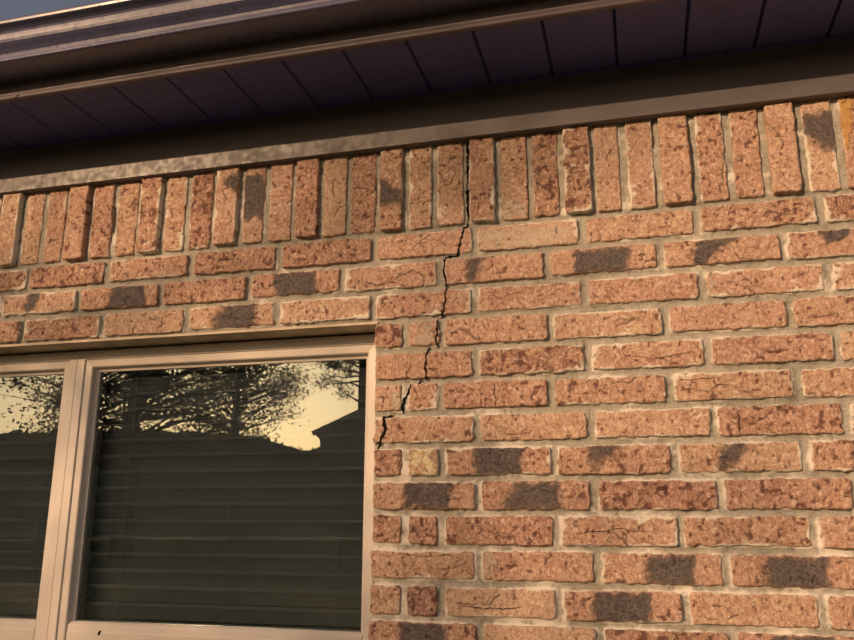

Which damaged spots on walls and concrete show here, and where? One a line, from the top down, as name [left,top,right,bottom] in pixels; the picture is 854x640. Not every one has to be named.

crack [377,142,472,449]